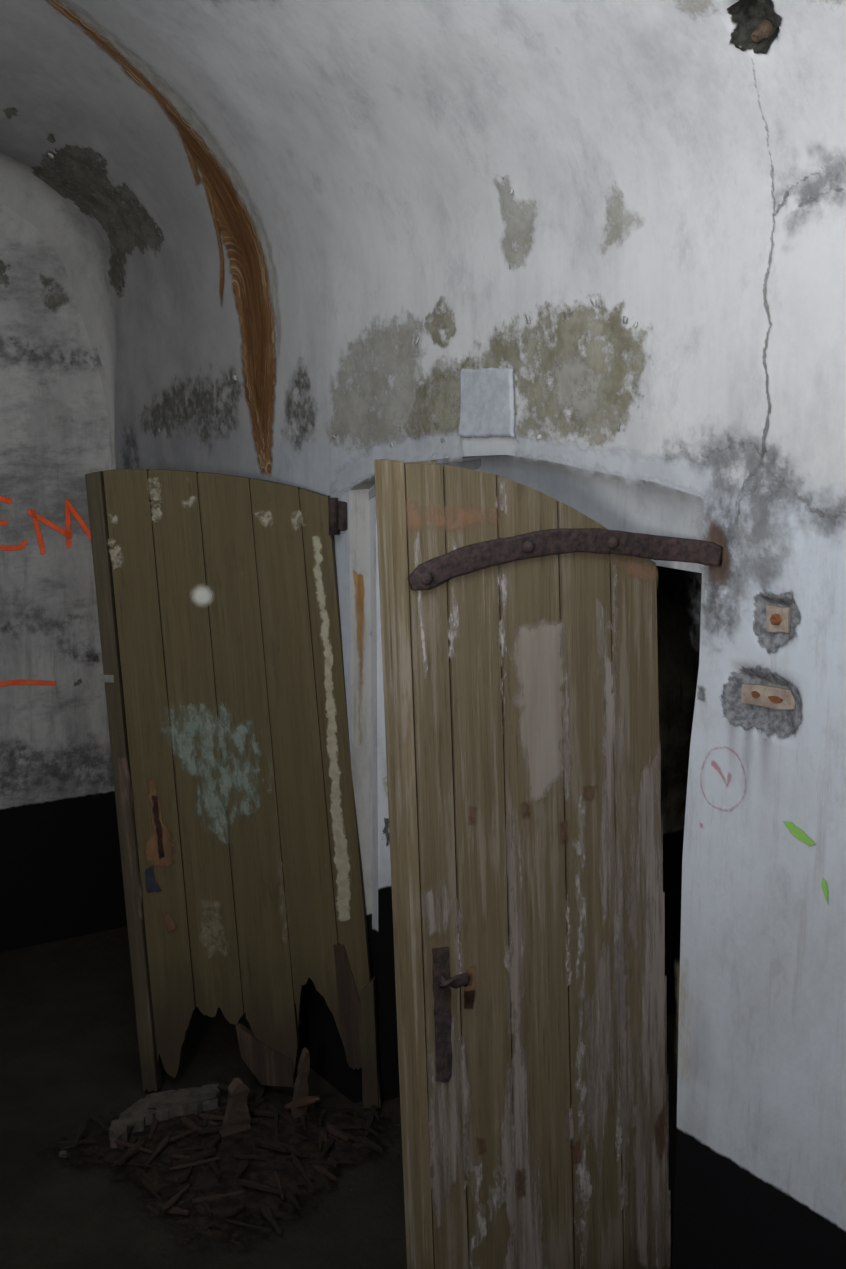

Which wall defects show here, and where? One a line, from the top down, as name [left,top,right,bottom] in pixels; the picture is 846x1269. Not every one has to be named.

spalling [727,0,782,54]
peeling [41,276,69,310]
peeling [32,134,164,298]
corrosion [46,0,279,475]
crack [716,163,846,517]
damp [704,439,783,574]
spalling [753,592,801,653]
spalling [721,665,802,738]